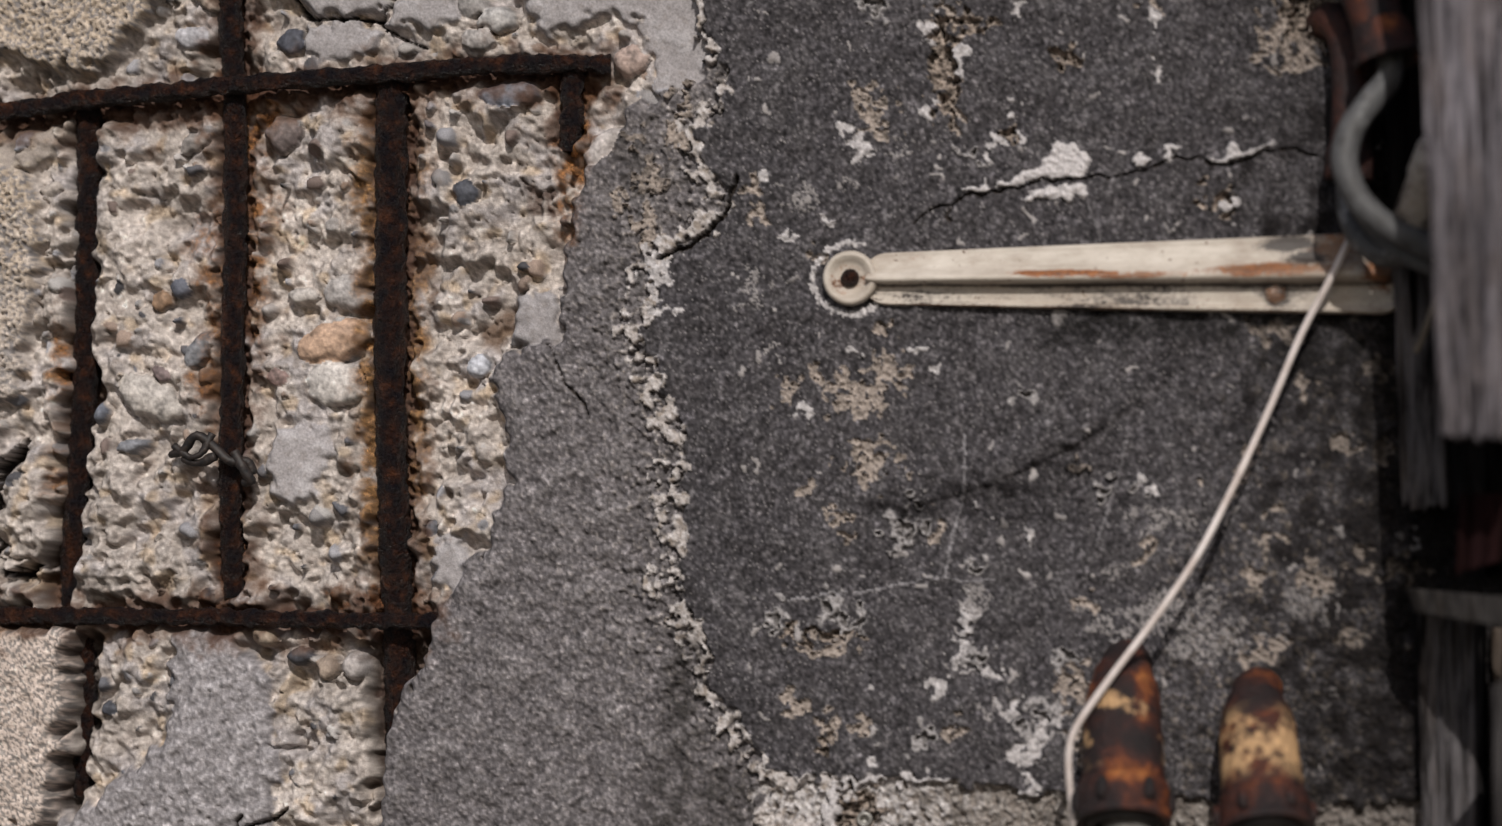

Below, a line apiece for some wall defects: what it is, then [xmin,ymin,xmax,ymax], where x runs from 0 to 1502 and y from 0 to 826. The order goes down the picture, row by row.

peeling [1134,0,1166,34]
rust [557,145,584,209]
crack [661,178,739,260]
crack [914,140,1325,242]
rust [46,336,72,391]
spalling [0,0,1092,826]
rust [361,417,379,518]
crack [0,448,45,583]
crack [238,812,287,826]
spalling [1172,796,1216,826]
spalling [1315,798,1422,826]